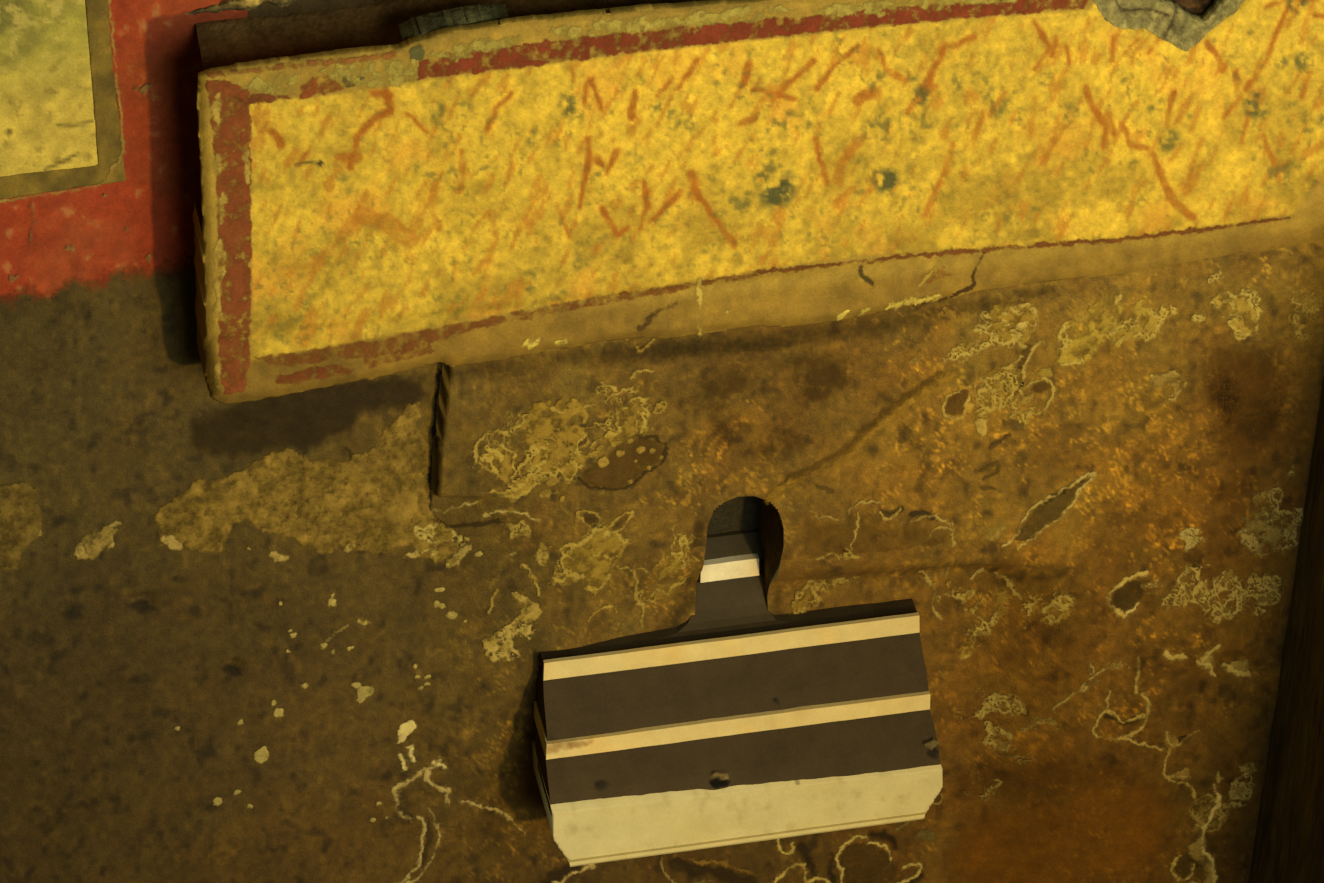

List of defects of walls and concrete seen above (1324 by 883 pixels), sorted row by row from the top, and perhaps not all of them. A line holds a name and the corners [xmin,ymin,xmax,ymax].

spalling [1092,0,1245,51]
peeling [526,369,653,448]
crack [427,369,540,528]
peeling [472,429,510,463]
peeling [155,403,482,567]
peeling [434,587,467,623]
spalling [1109,570,1149,618]